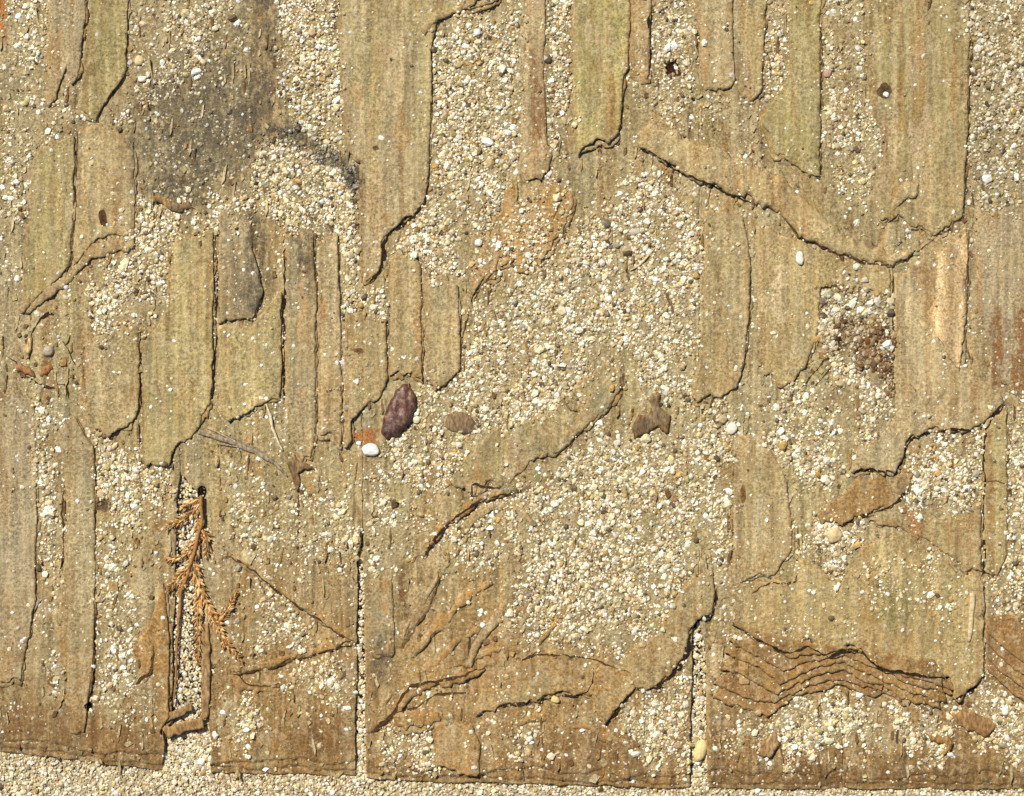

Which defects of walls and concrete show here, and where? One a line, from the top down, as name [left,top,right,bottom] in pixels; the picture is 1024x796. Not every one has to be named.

leakage [144,0,281,203]
leakage [268,125,361,191]
crack [367,188,427,283]
crack [638,148,752,205]
crack [781,21,975,399]
crack [8,341,75,398]
crack [31,312,54,335]
spalling [442,501,517,575]
crack [838,405,1005,579]
crack [499,592,717,726]